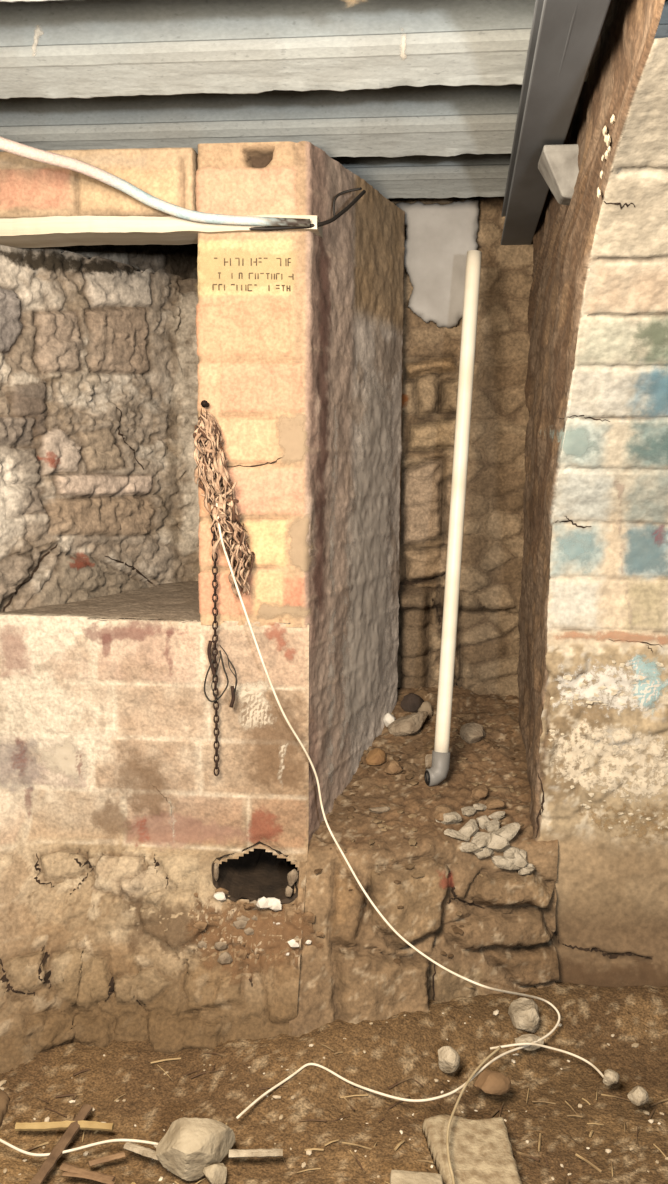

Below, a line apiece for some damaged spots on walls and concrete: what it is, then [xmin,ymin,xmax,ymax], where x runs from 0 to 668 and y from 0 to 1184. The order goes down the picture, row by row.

damp [557,631,668,644]
crack [34,849,94,894]
spalling [187,841,324,984]
crack [554,932,652,959]
crack [0,945,51,996]
crack [105,972,143,1007]